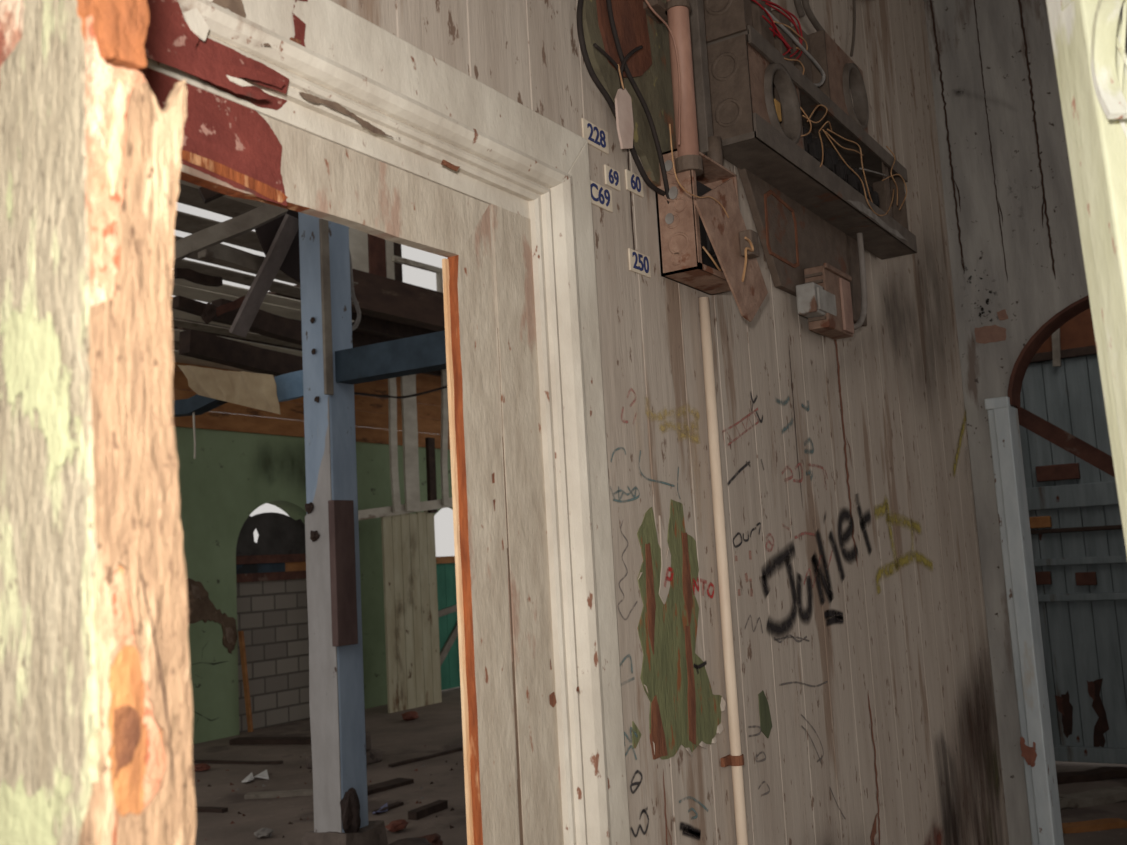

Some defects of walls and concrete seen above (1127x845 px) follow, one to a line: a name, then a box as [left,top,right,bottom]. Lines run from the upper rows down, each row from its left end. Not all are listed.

peeling [86,0,400,306]
peeling [0,298,80,484]
peeling [0,770,72,845]
flaking render [107,565,165,817]
flaking render [186,578,237,654]
peeling [632,499,726,760]
leakage [942,673,1002,845]